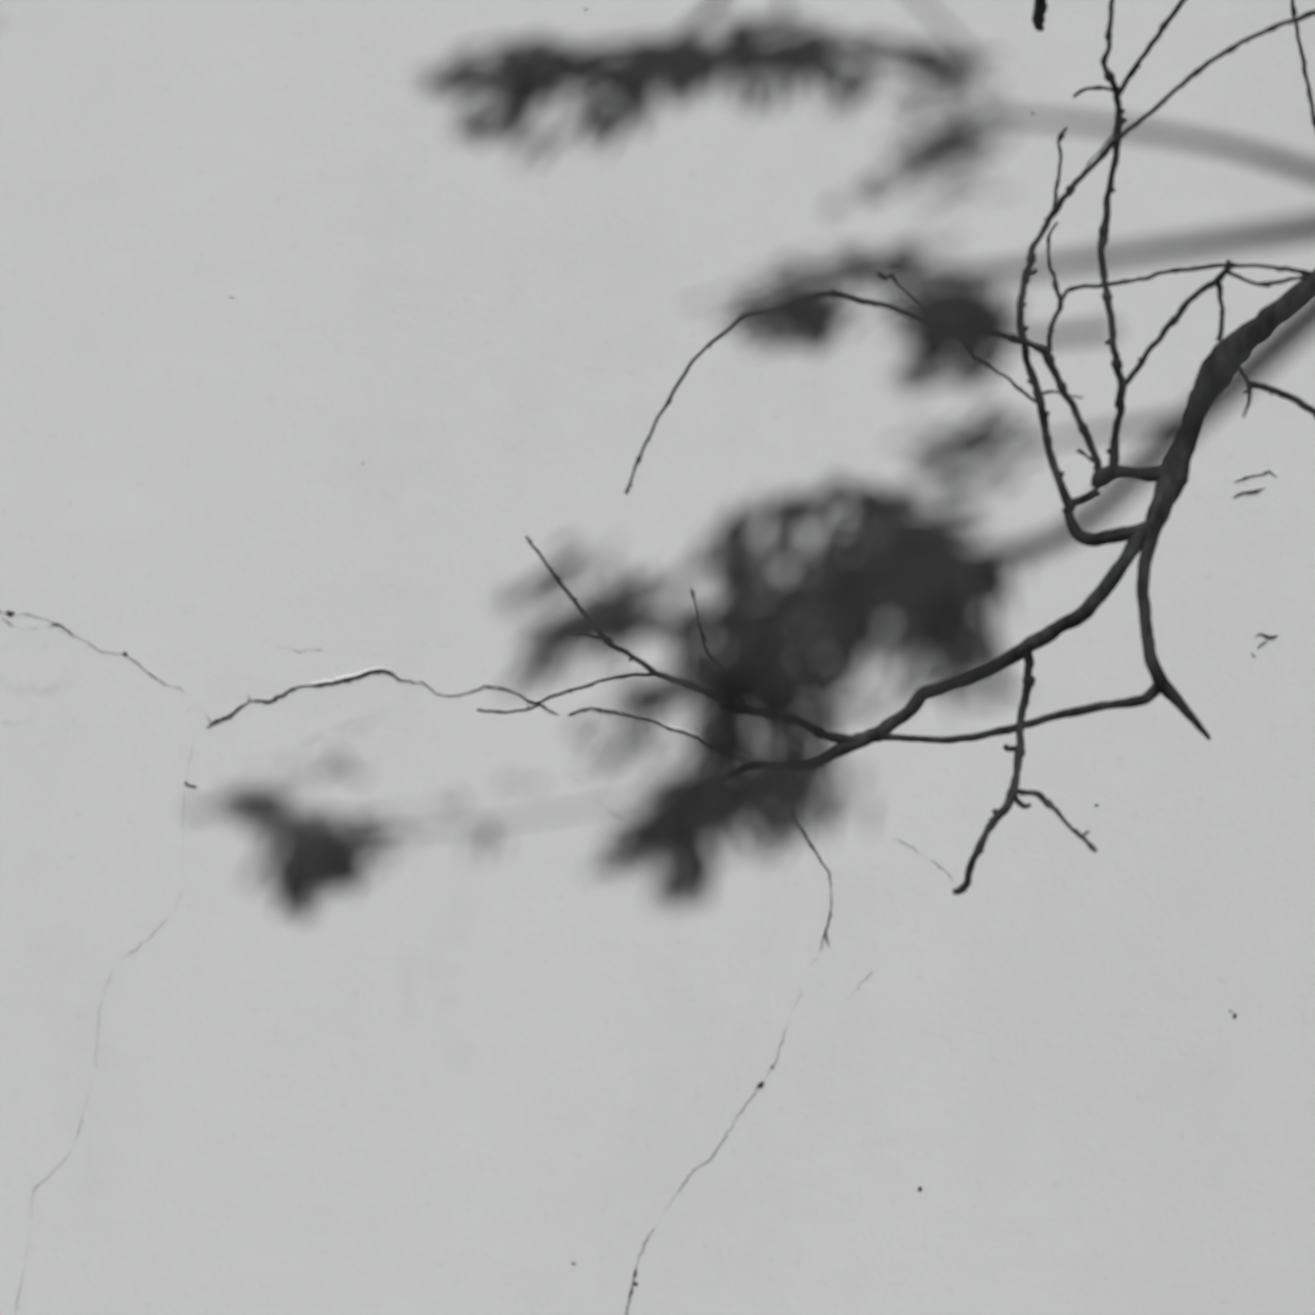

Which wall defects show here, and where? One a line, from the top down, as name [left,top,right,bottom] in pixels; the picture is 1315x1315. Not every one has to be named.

crack [0,611,688,1315]
crack [626,823,832,1315]